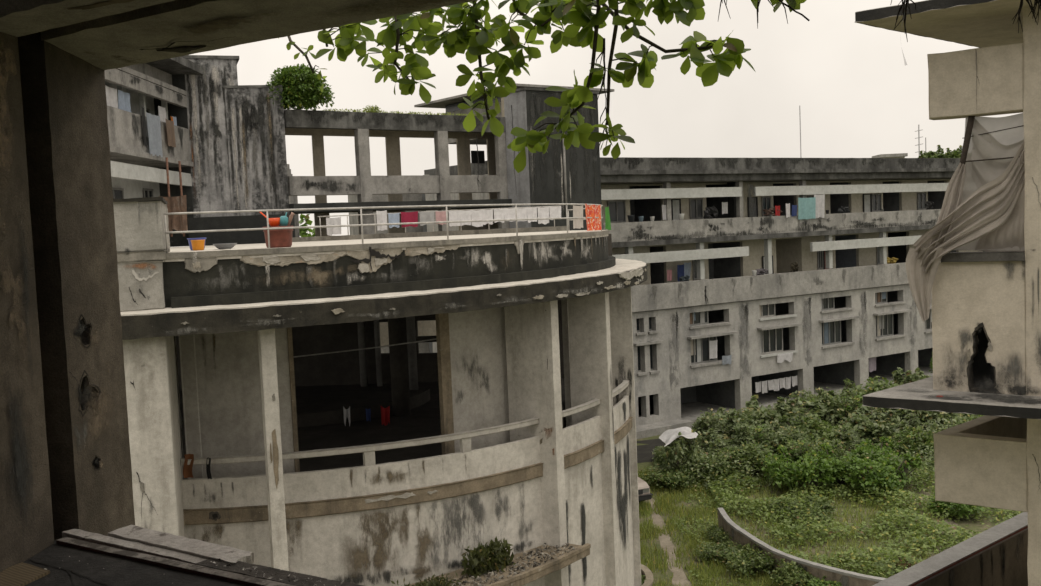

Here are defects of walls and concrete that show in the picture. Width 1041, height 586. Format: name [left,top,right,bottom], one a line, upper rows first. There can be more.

leakage [167,67,277,215]
peeling [240,244,460,280]
peeling [472,252,493,271]
spalling [74,313,98,349]
spalling [972,328,995,387]
leakage [611,360,632,547]
leakage [433,496,483,537]
leakage [336,506,464,584]
leakage [514,524,532,552]